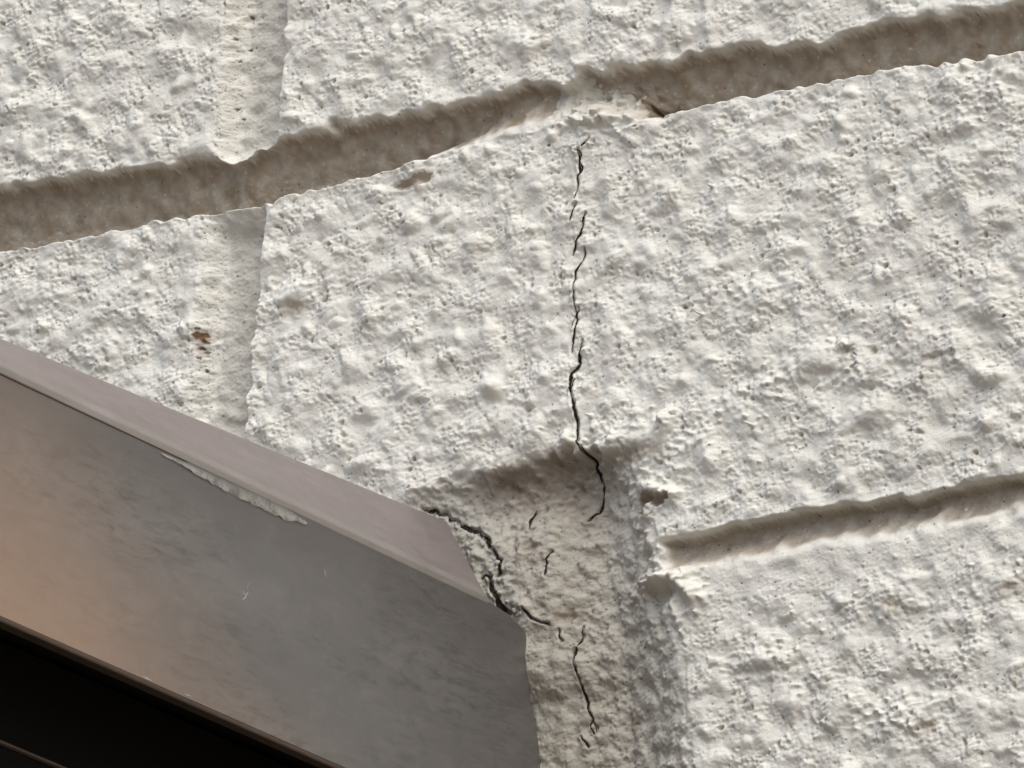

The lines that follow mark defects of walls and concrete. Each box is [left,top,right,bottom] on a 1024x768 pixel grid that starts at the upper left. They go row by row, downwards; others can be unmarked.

crack [568,140,605,521]
crack [422,508,597,748]